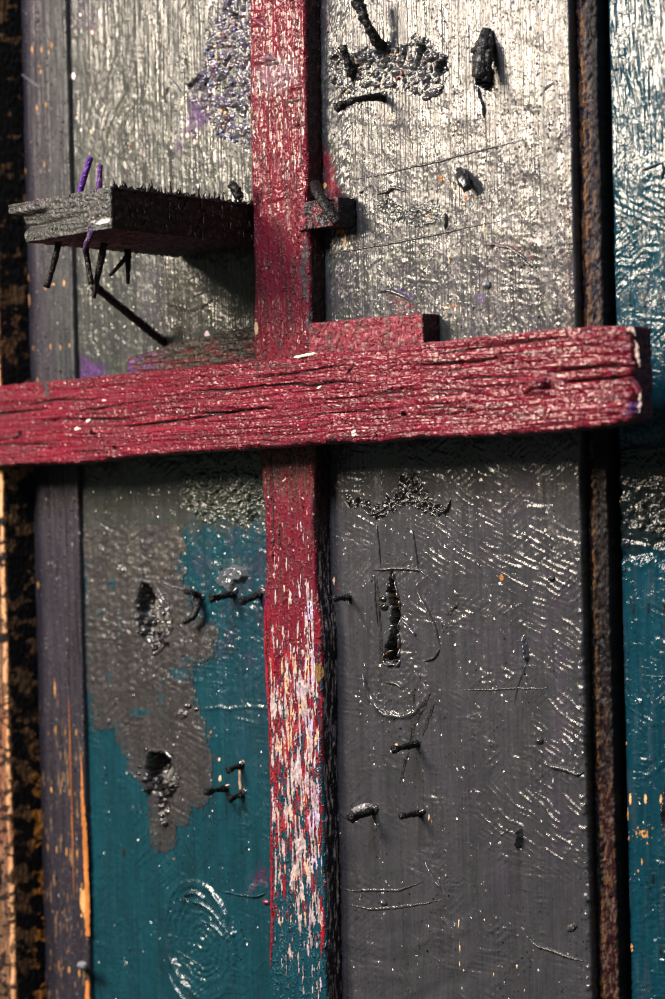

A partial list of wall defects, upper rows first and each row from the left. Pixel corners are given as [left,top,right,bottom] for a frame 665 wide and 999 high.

crack [0,337,638,446]
peeling [264,556,326,999]